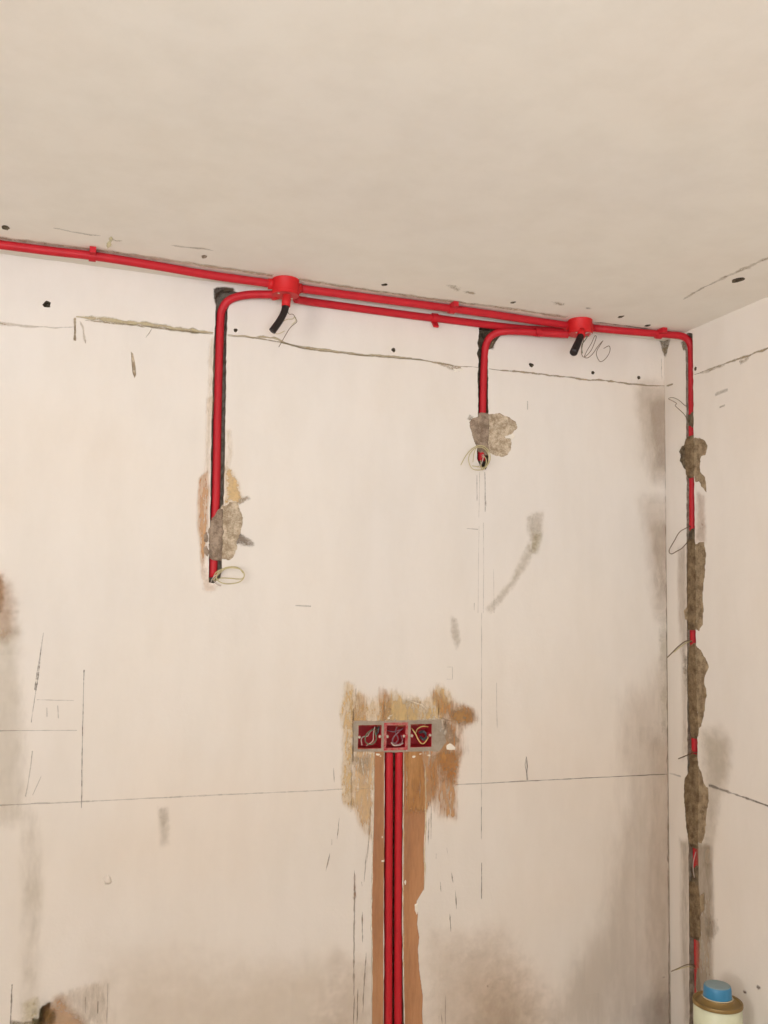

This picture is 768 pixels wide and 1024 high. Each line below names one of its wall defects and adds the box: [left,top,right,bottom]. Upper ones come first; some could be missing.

spalling [203,502,243,560]
peeling [371,752,384,1024]
peeling [403,752,431,1024]